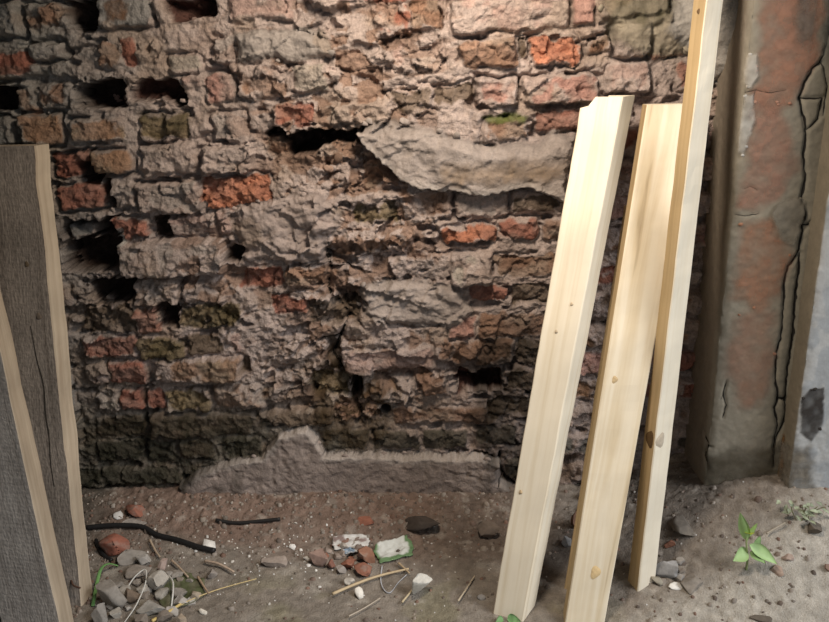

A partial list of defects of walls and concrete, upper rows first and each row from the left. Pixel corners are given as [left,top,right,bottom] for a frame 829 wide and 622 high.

spalling [74,75,190,110]
spalling [166,0,219,24]
spalling [369,0,448,76]
spalling [458,35,581,70]
flaking render [267,117,576,202]
spalling [60,215,185,335]
spalling [247,199,417,324]
crack [747,33,829,466]
spalling [257,337,384,421]
damp [483,340,533,466]
peeling [801,387,824,441]
flaking render [178,425,512,495]